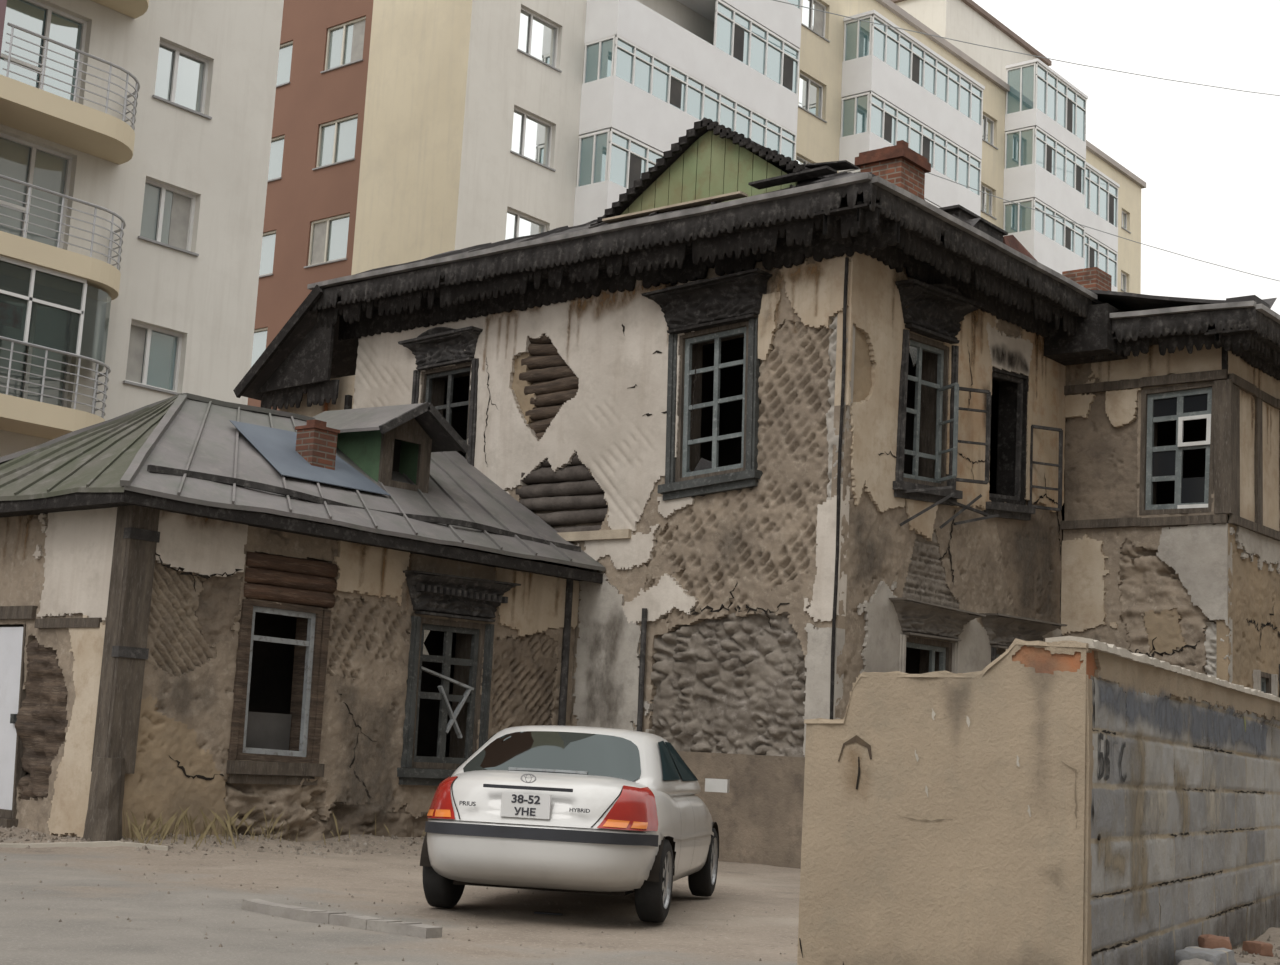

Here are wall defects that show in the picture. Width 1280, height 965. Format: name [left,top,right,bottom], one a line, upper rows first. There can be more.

peeling [15,507,117,838]
crack [169,756,224,780]
peeling [353,252,1280,757]
crack [1129,637,1200,657]